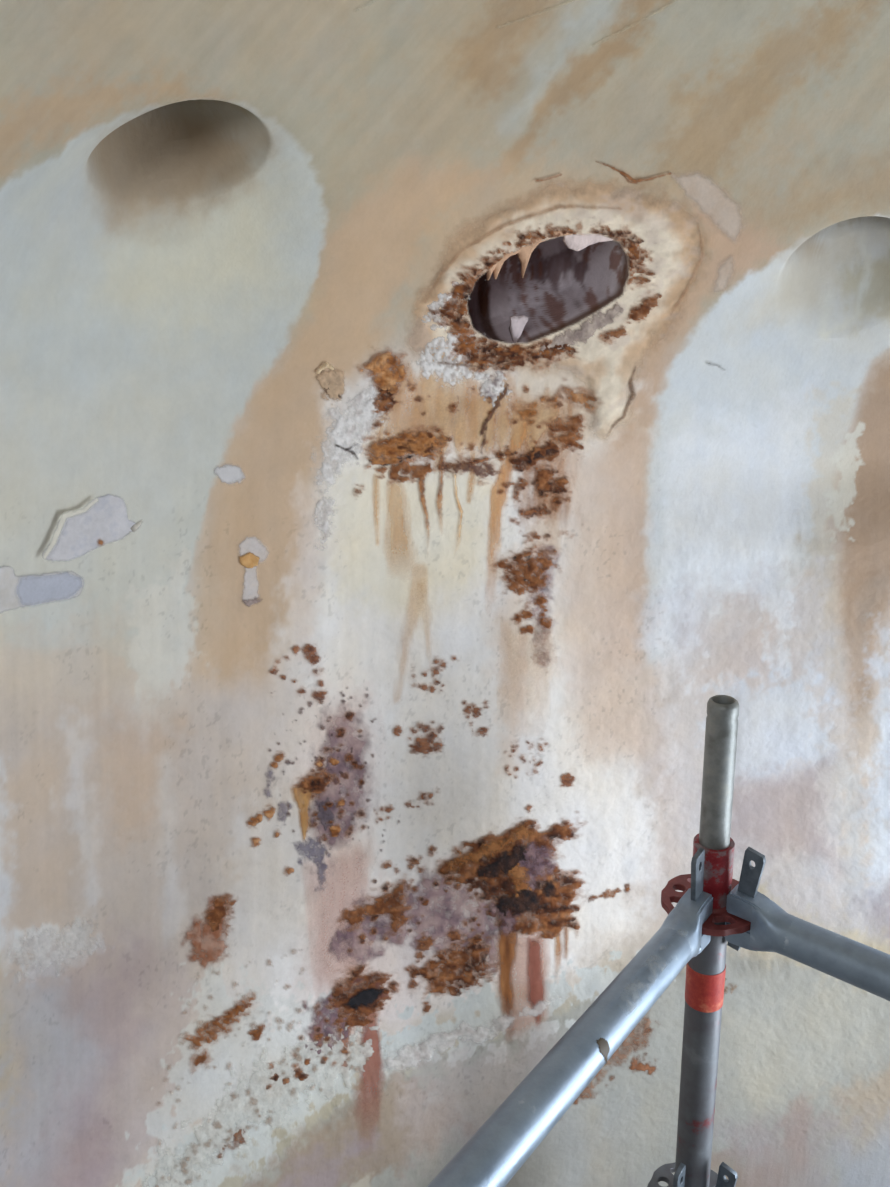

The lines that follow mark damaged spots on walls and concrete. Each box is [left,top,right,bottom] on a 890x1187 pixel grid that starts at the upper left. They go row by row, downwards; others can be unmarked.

crack [603,164,671,184]
peeling [563,234,614,251]
peeling [509,315,528,344]
corrosion [360,351,406,415]
peeling [214,465,245,483]
corrosion [366,427,463,537]
corrosion [509,387,597,519]
peeling [0,495,142,613]
peeling [240,537,268,606]
corrosion [494,532,557,666]
corrosion [331,805,630,1027]
efflorescence [386,1001,548,1070]